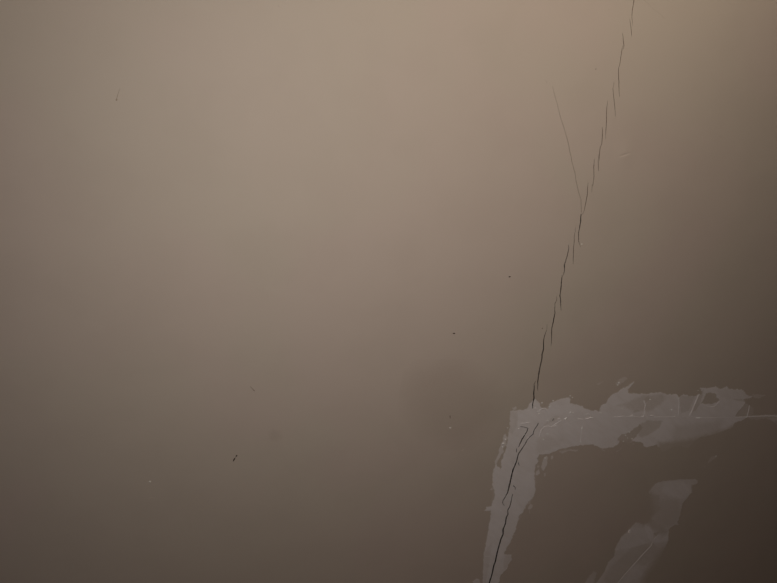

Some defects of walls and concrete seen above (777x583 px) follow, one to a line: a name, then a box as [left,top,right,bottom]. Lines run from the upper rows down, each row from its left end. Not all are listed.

crack [489,2,634,583]